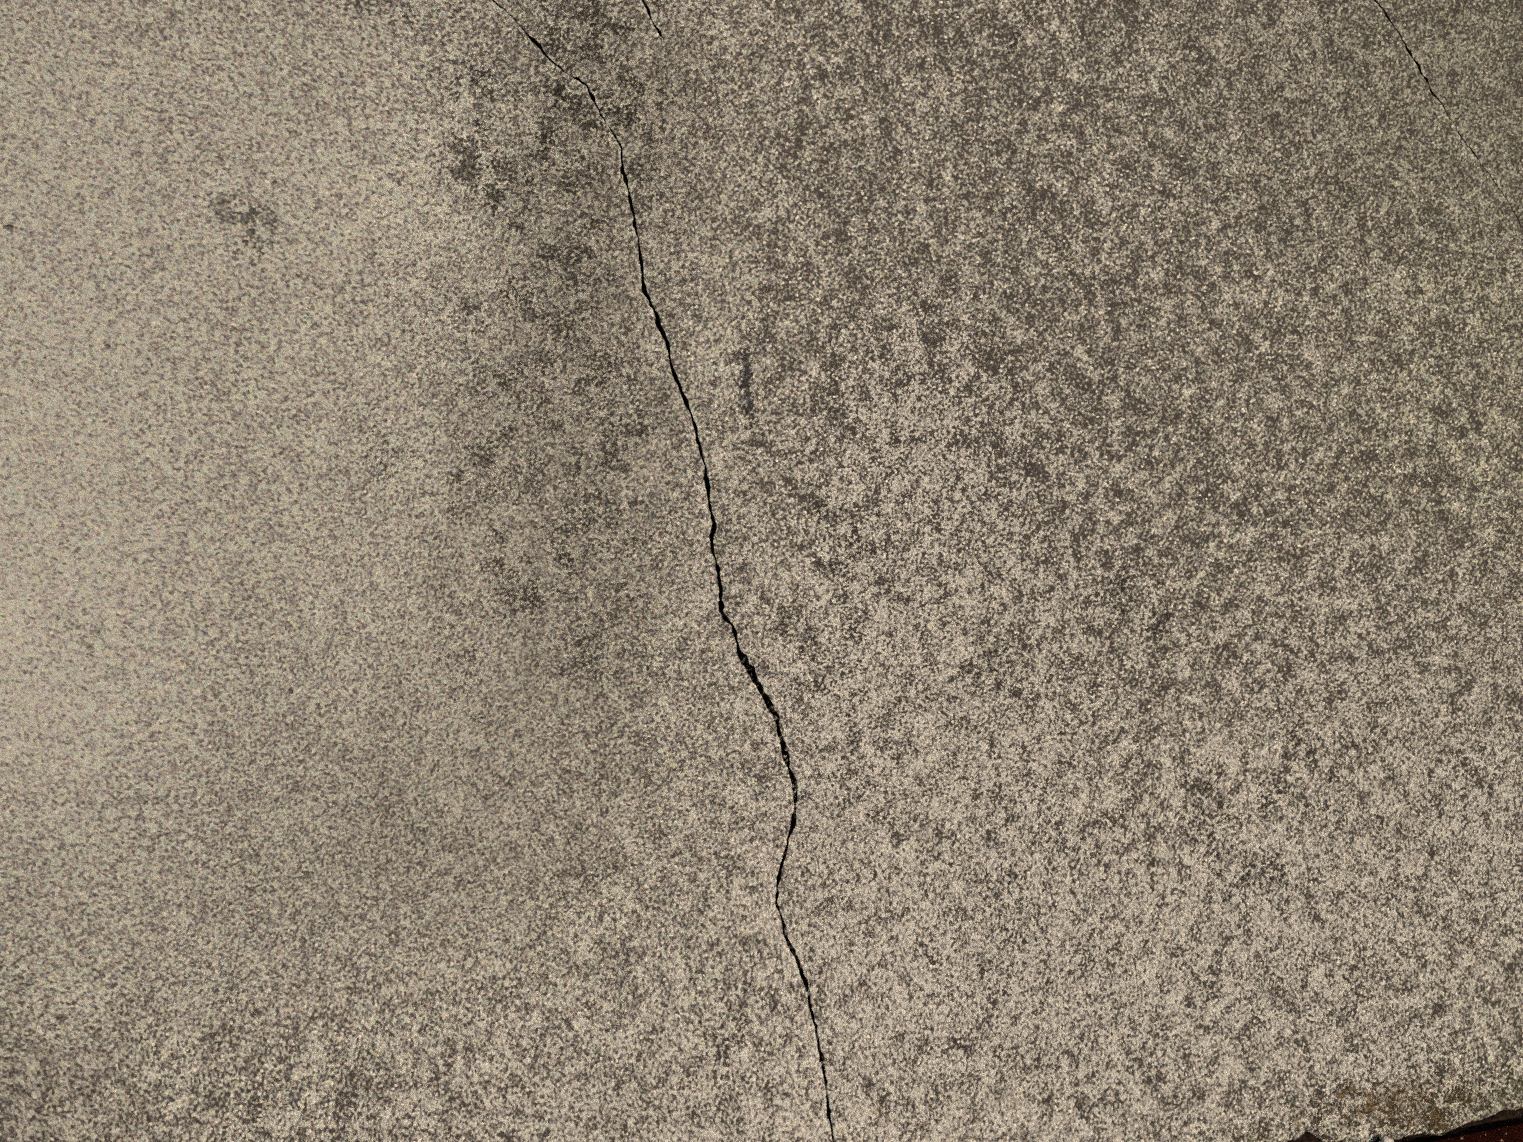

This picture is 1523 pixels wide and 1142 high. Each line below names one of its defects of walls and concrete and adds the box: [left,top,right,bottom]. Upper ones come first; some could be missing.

crack [492,0,835,1142]